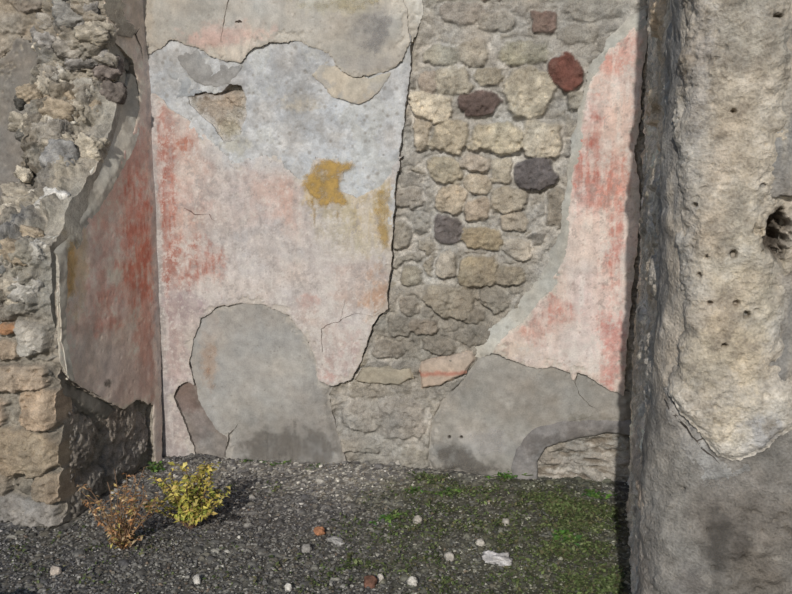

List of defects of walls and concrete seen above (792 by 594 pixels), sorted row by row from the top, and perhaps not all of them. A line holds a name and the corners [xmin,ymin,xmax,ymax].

spalling [148,0,424,227]
spalling [175,303,347,463]
spalling [428,353,631,476]